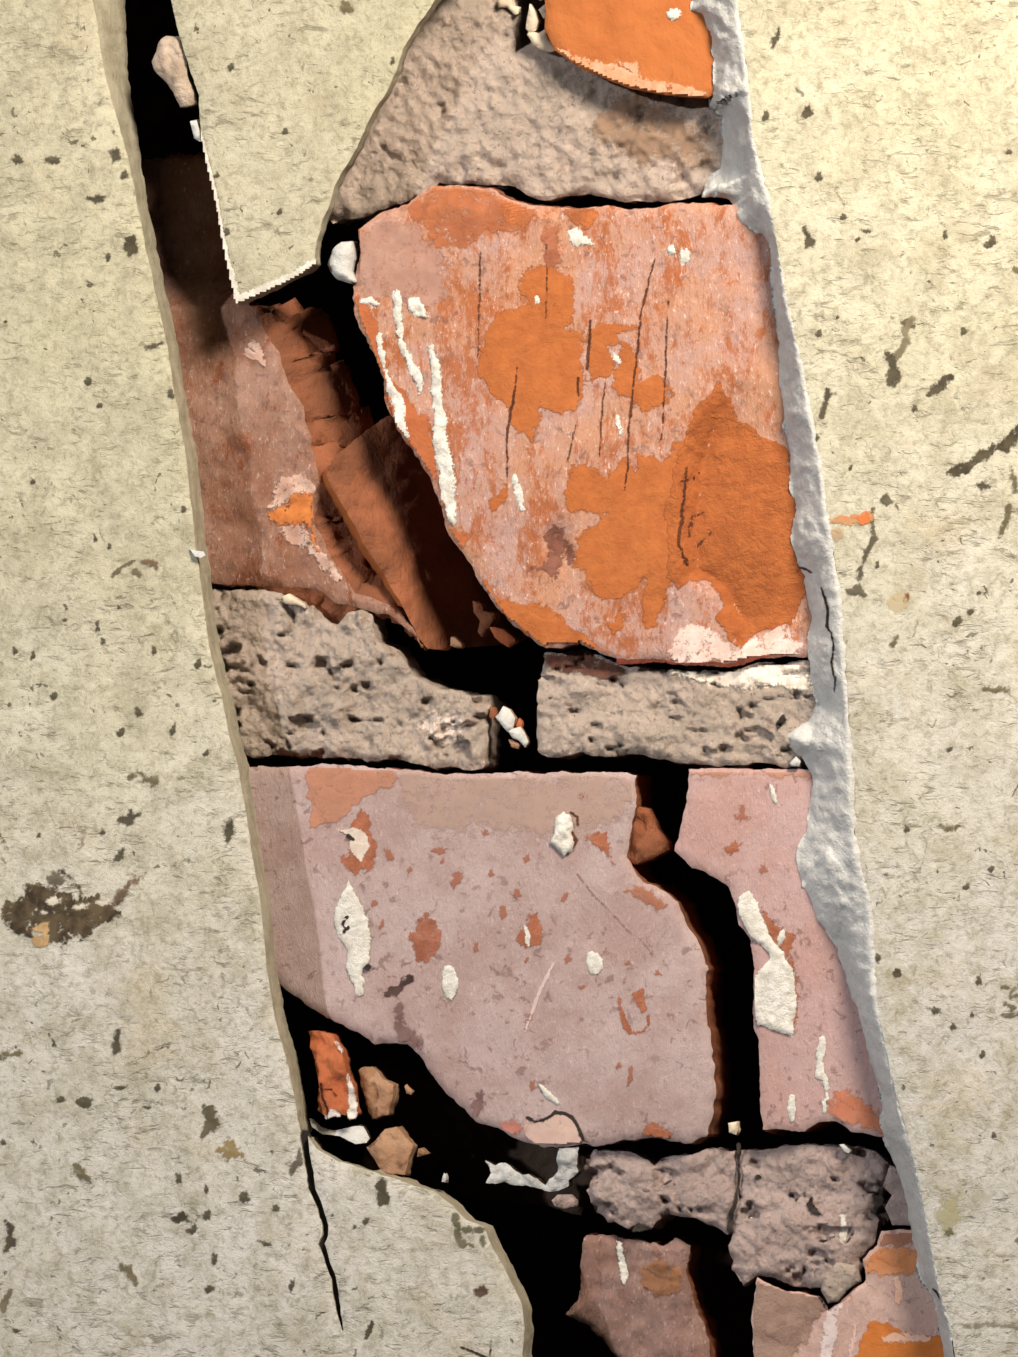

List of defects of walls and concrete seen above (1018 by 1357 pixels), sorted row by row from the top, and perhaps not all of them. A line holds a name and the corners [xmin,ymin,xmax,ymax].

spalling [201,133,316,303]
peeling [405,187,675,443]
peeling [355,295,444,505]
peeling [267,492,322,552]
peeling [472,579,619,656]
peeling [489,706,531,749]
flaking render [531,0,955,1357]
peeling [305,767,397,876]
spalling [408,912,441,963]
peeling [515,912,542,962]
peeling [500,1114,581,1144]
crack [289,1130,343,1328]